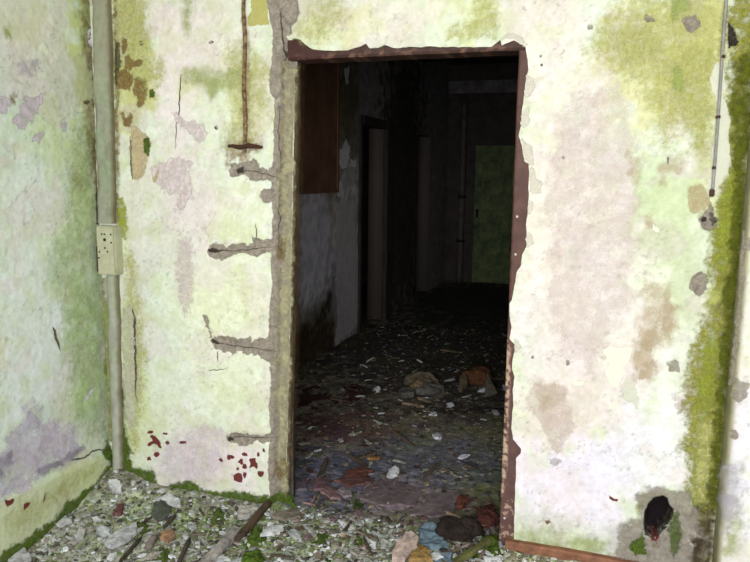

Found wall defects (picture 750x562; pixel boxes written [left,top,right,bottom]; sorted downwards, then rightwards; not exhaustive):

peeling [0,93,43,130]
peeling [117,39,148,107]
peeling [688,62,732,230]
spalling [202,0,305,496]
damp [102,278,112,441]
spalling [616,487,700,562]